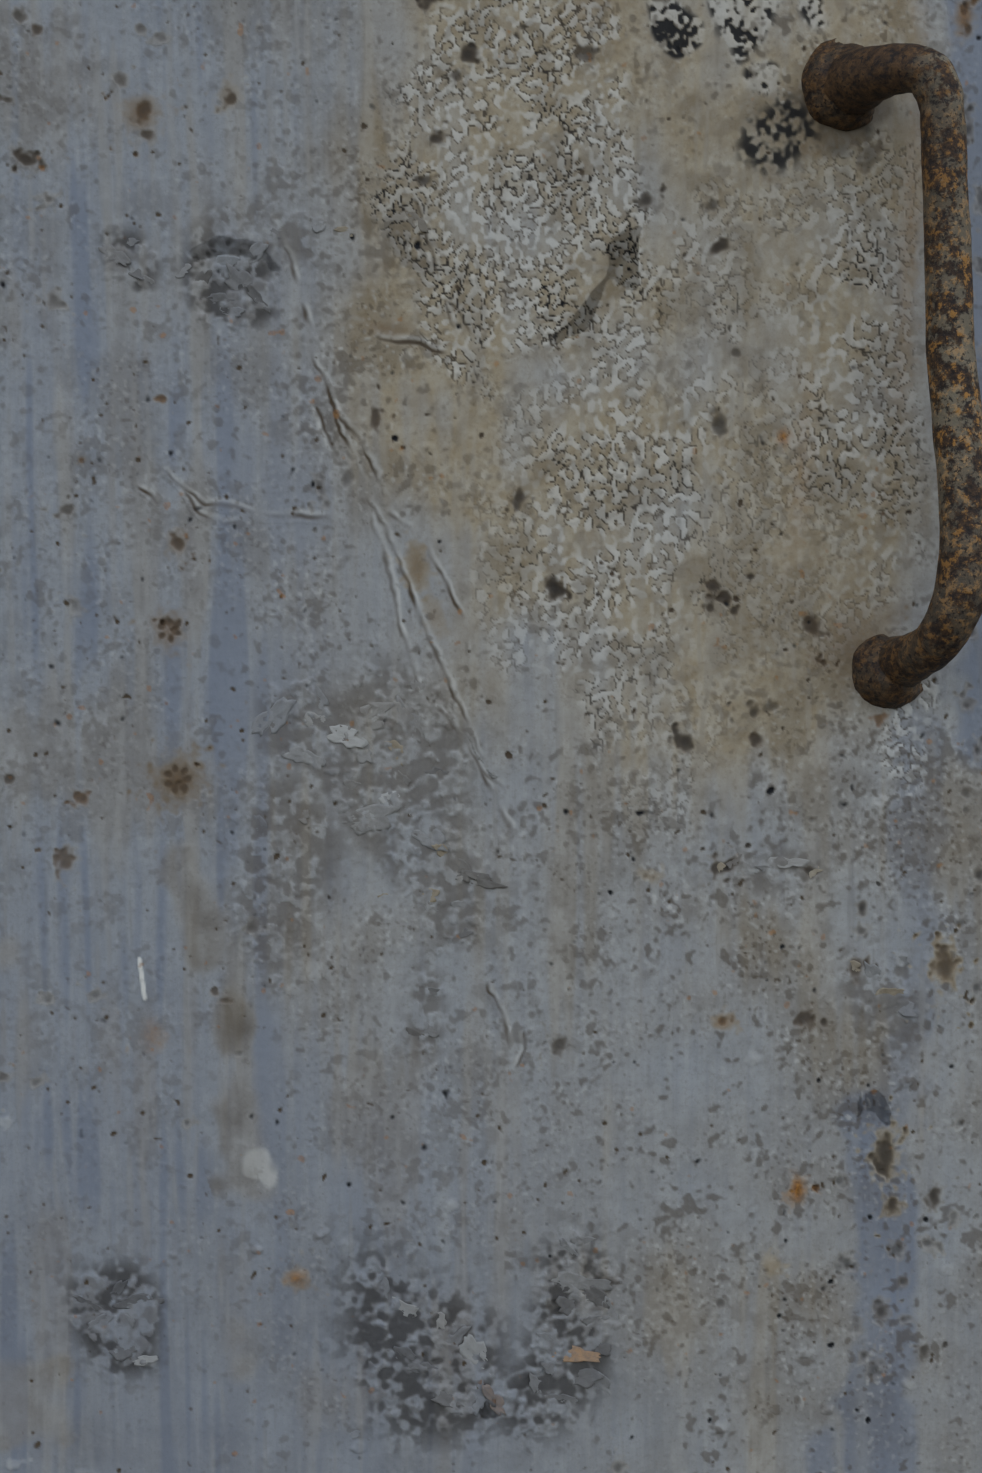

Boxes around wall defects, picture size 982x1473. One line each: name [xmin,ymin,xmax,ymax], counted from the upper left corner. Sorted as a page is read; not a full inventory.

crack [131,0,739,838]
rust [783,564,925,711]
crack [789,141,922,602]
rust [749,0,982,463]